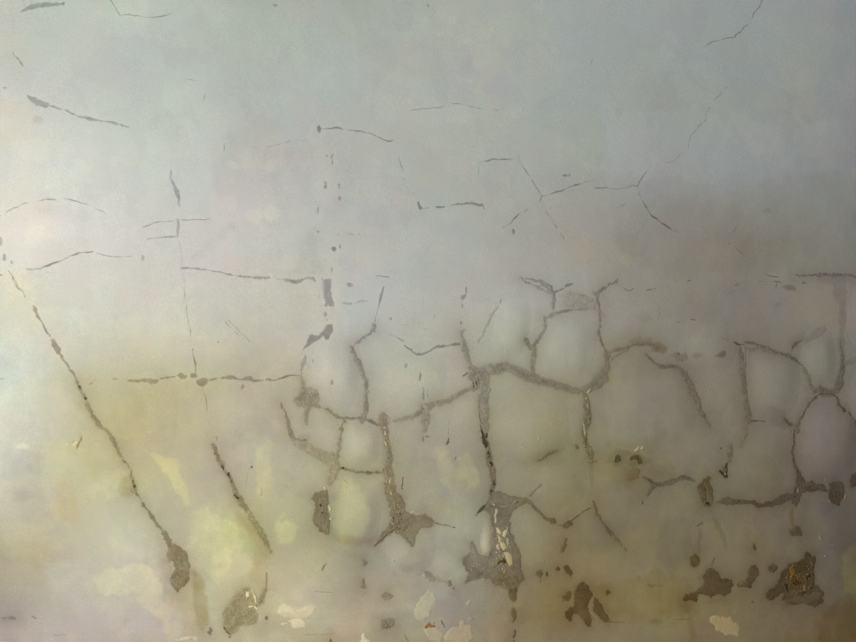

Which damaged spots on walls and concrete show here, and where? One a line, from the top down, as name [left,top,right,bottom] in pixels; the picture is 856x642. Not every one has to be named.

crack [223,125,485,210]
crack [477,65,727,239]
crack [0,153,360,548]
crack [210,436,273,593]
spalling [175,585,317,641]
spalling [310,486,332,536]
spalling [373,482,456,547]
crack [280,275,711,552]
spalling [414,490,625,642]
spalling [682,553,778,637]
spalling [696,444,856,508]
crack [722,272,856,471]